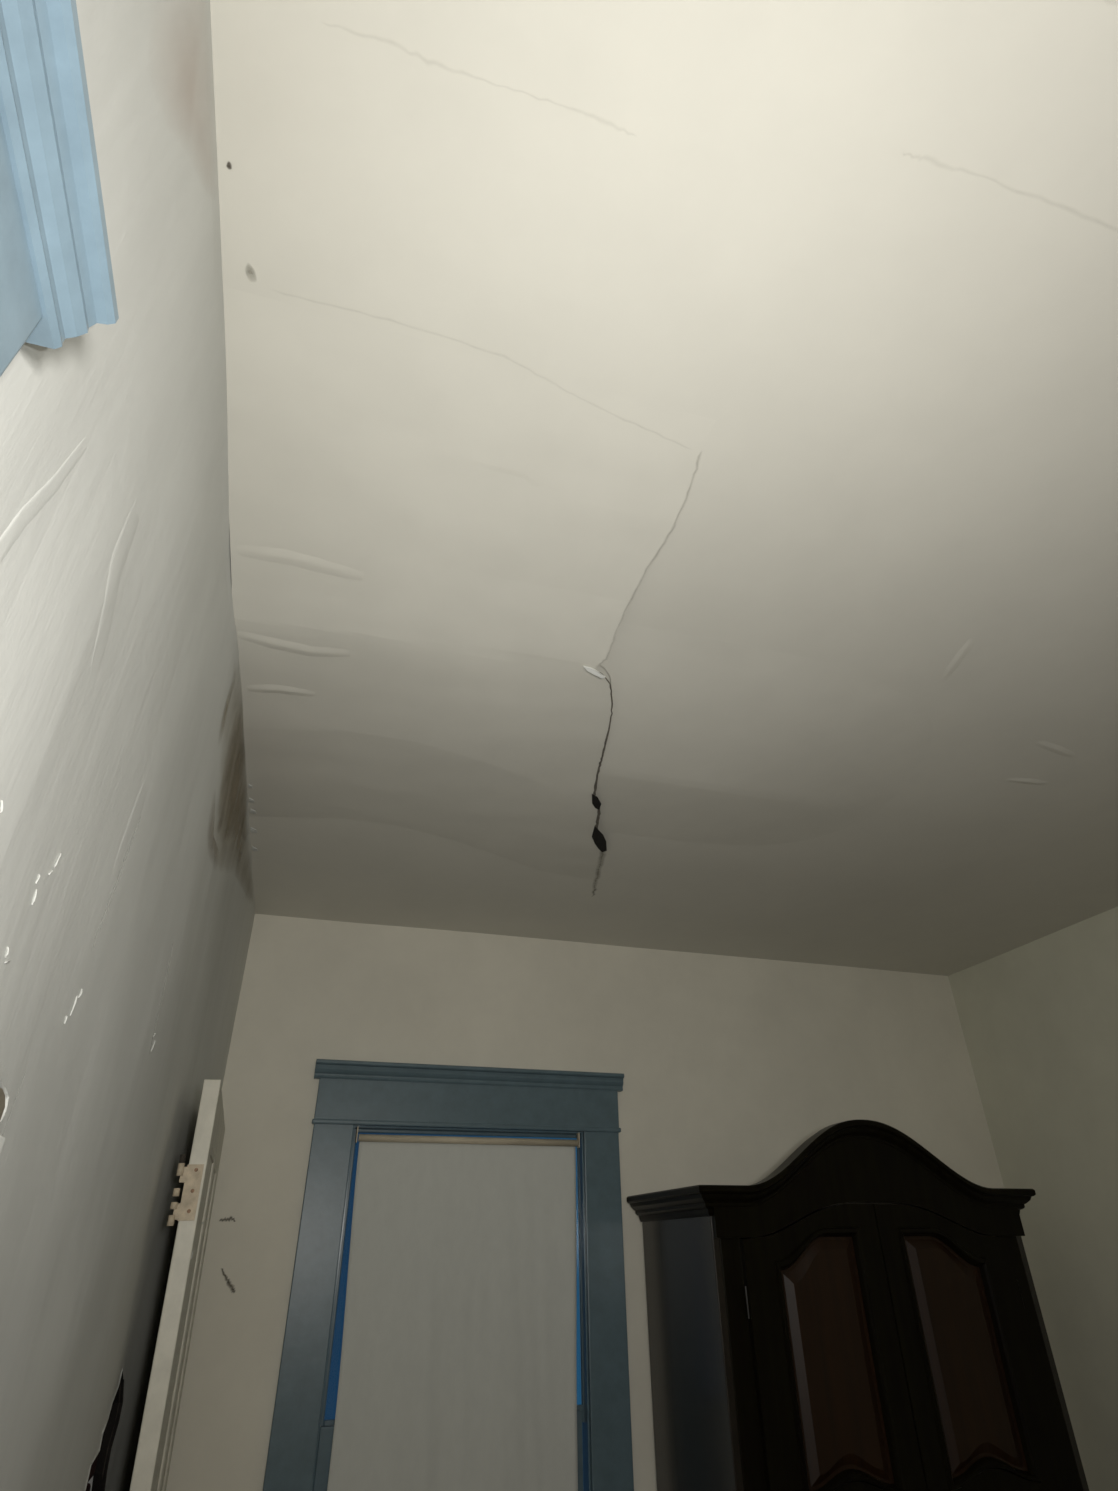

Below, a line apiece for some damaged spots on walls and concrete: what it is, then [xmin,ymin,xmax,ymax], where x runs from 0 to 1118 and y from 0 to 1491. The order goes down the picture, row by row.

crack [583,666,613,893]
spalling [84,1369,124,1491]